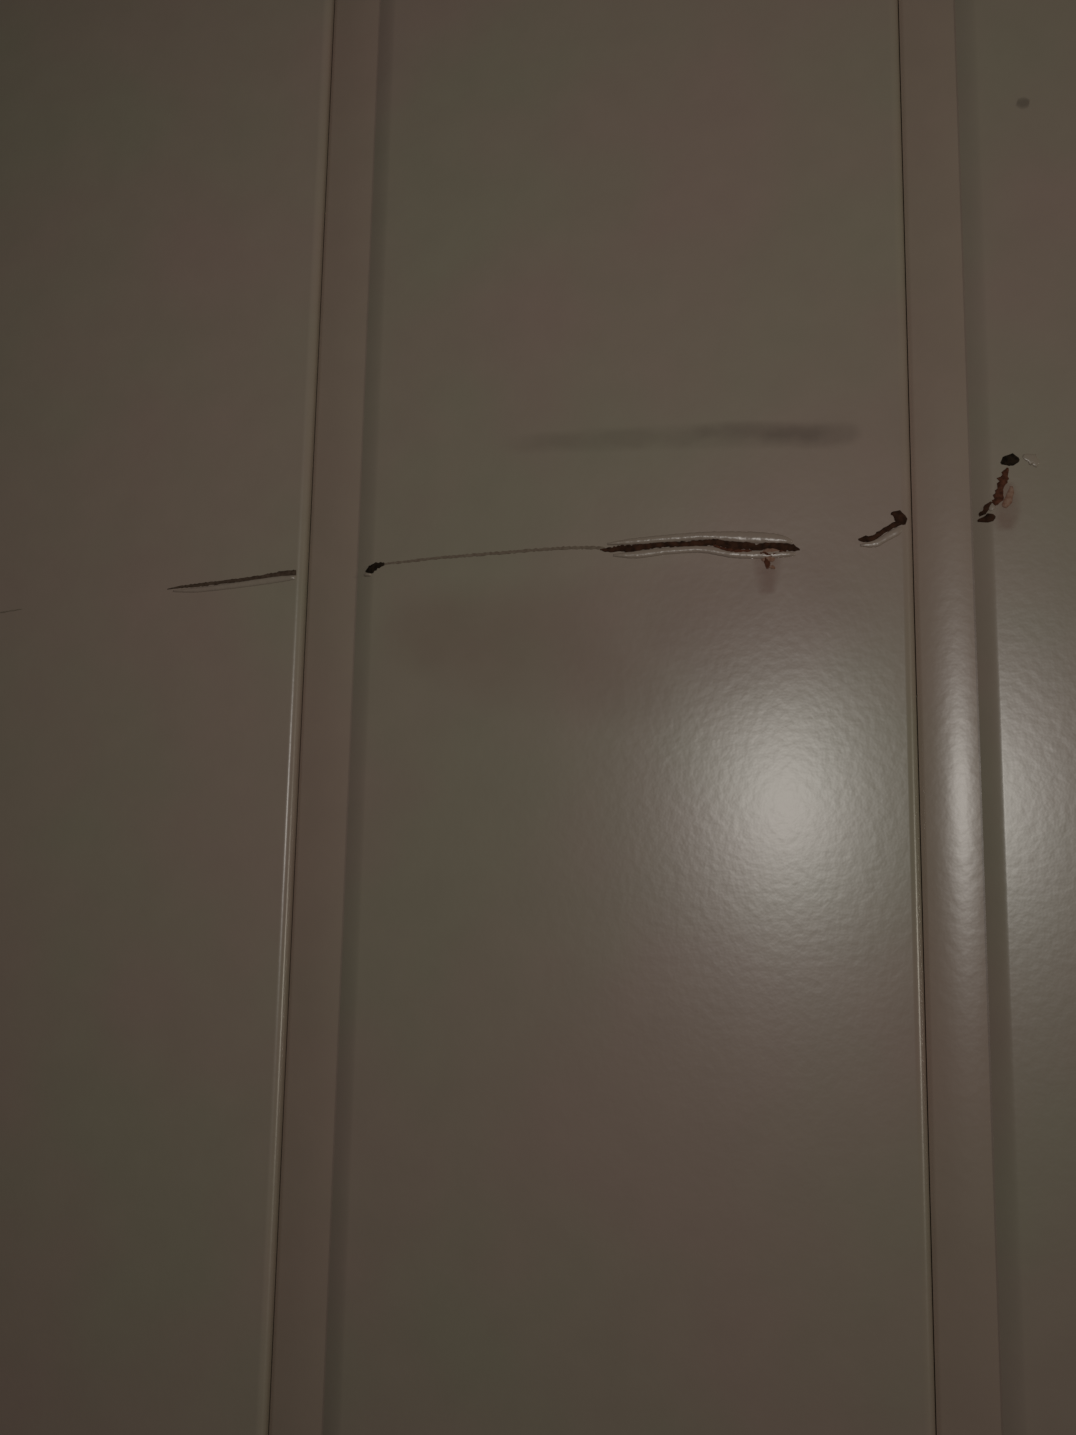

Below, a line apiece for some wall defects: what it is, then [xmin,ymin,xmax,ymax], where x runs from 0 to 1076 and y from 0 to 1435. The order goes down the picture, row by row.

crack [858,510,907,548]
crack [364,531,800,577]
crack [167,570,296,593]